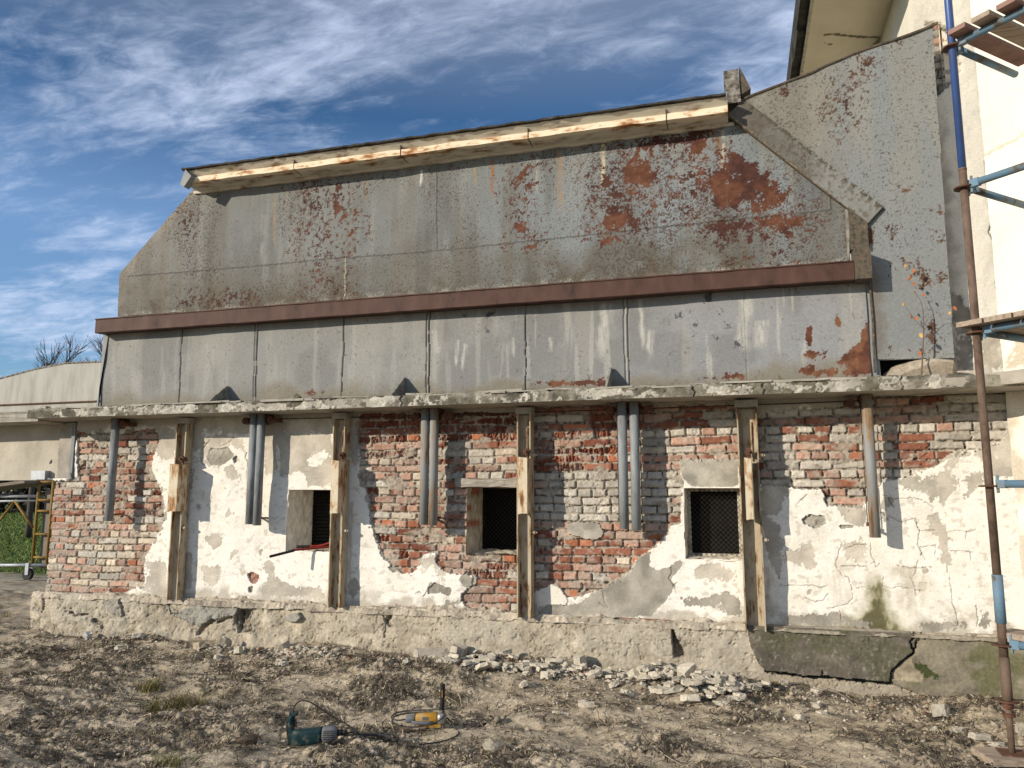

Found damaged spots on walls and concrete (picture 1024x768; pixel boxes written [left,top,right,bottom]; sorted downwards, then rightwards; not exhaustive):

corrosion [816,39,916,147]
corrosion [279,172,374,302]
corrosion [489,123,830,269]
corrosion [868,222,904,245]
corrosion [884,255,949,289]
corrosion [799,317,871,378]
spalling [46,399,344,618]
spalling [355,383,756,621]
crack [798,489,829,506]
crack [785,494,977,624]
spalling [757,291,1024,592]
crack [772,632,917,685]